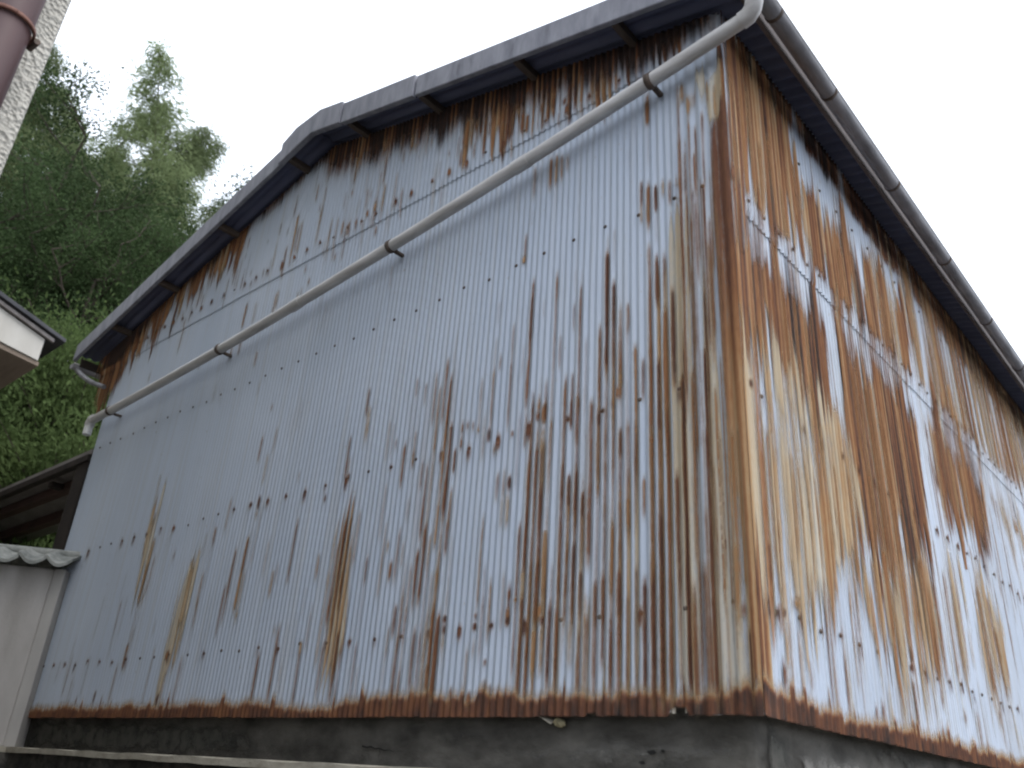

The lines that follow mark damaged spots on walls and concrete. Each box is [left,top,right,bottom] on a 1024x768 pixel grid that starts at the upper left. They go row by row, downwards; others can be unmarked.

corrosion [95,10,727,413]
corrosion [120,482,175,610]
corrosion [216,538,249,633]
corrosion [317,493,354,698]
corrosion [408,361,479,606]
corrosion [457,519,492,638]
corrosion [487,358,502,451]
corrosion [563,288,582,625]
corrosion [581,402,593,562]
corrosion [597,252,622,493]
corrosion [782,630,791,686]
corrosion [947,551,972,709]